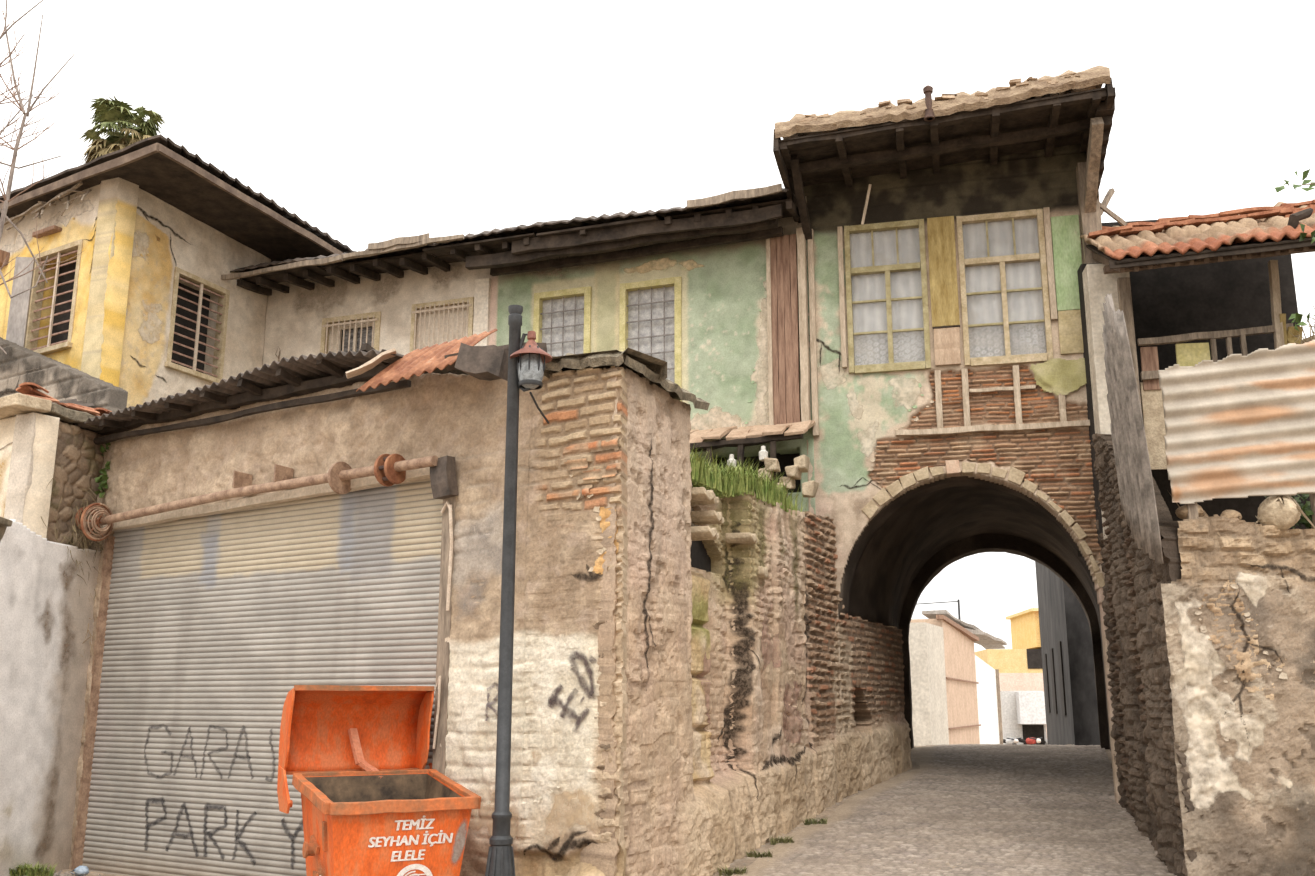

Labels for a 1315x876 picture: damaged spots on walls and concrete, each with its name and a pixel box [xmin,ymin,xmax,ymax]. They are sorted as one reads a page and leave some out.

crack [137,207,191,263]
spalling [564,436,619,575]
spalling [820,358,1103,564]
peeling [1174,572,1288,809]
crack [1224,564,1315,750]